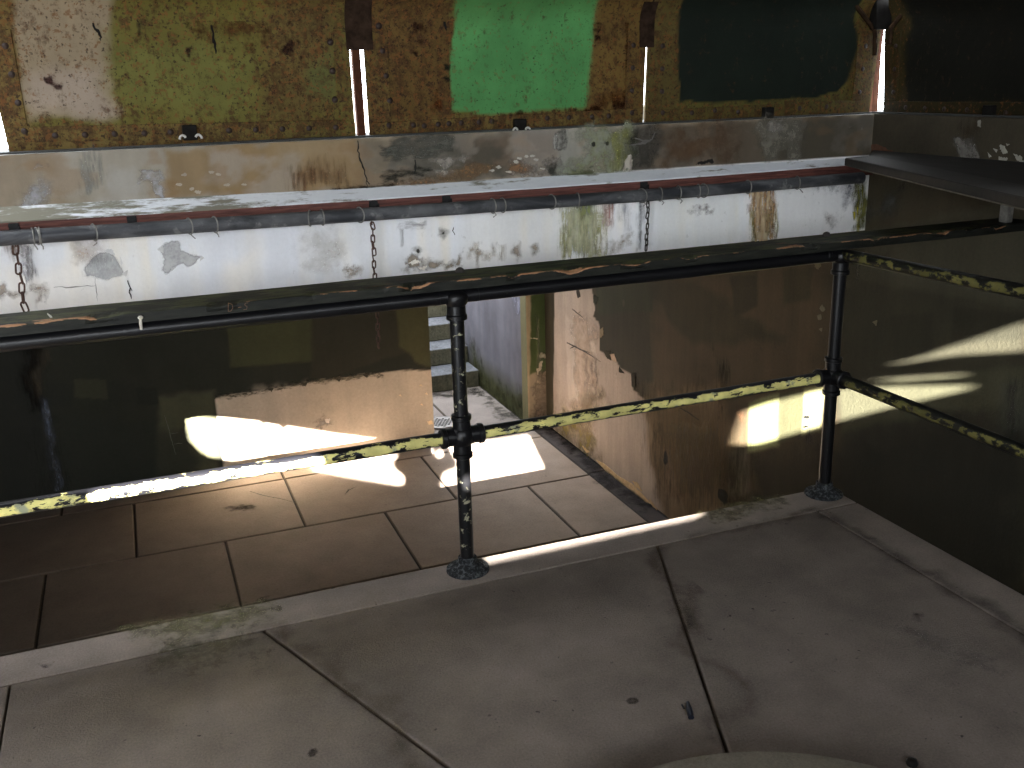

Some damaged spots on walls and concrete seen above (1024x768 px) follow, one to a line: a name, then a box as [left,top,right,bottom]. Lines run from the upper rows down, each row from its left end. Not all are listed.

crack [357,141,370,187]
damp [334,133,454,190]
peeling [954,120,1024,162]
peeling [85,249,128,279]
peeling [157,241,204,273]
peeling [604,350,636,388]